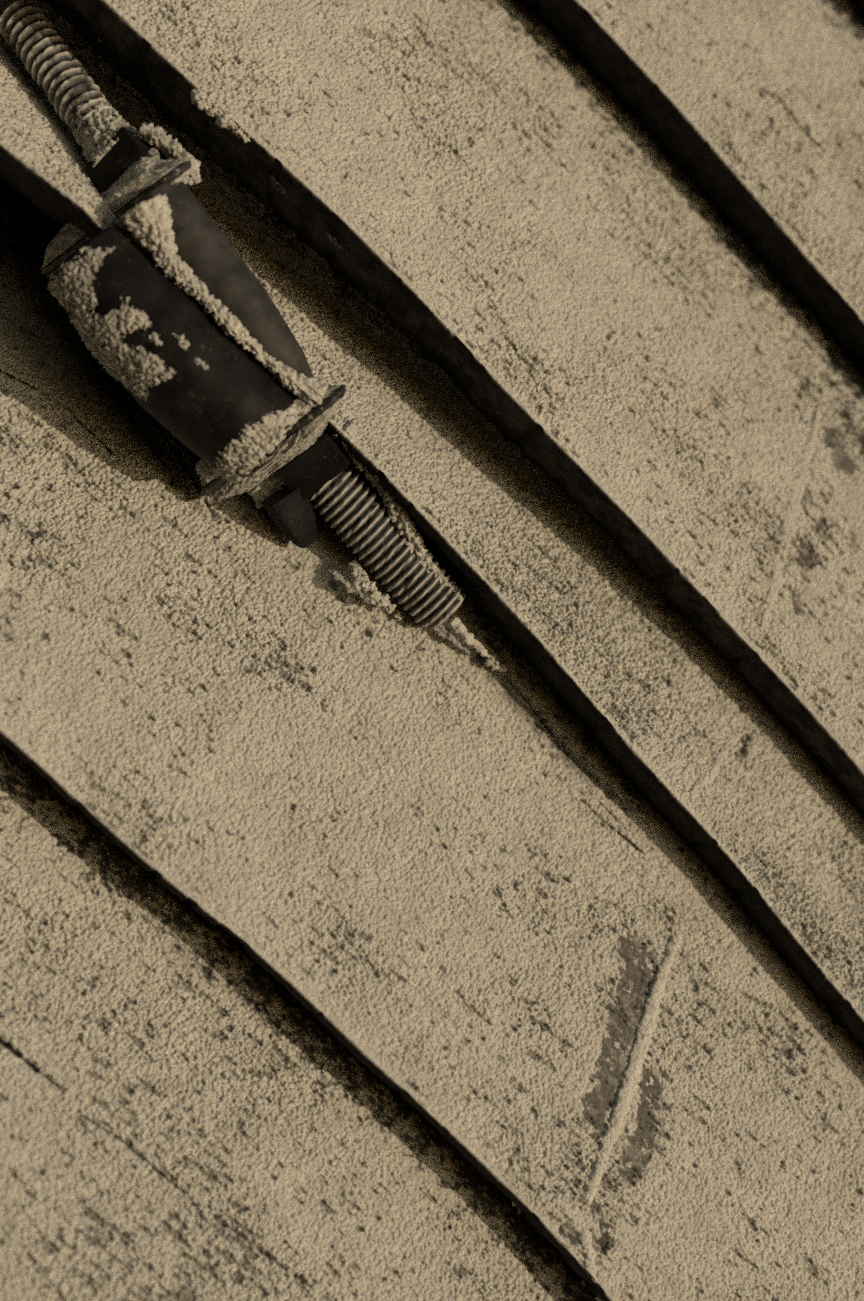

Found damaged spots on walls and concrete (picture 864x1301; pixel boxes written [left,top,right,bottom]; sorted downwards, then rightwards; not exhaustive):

peeling [48,246,209,401]
peeling [212,403,300,483]